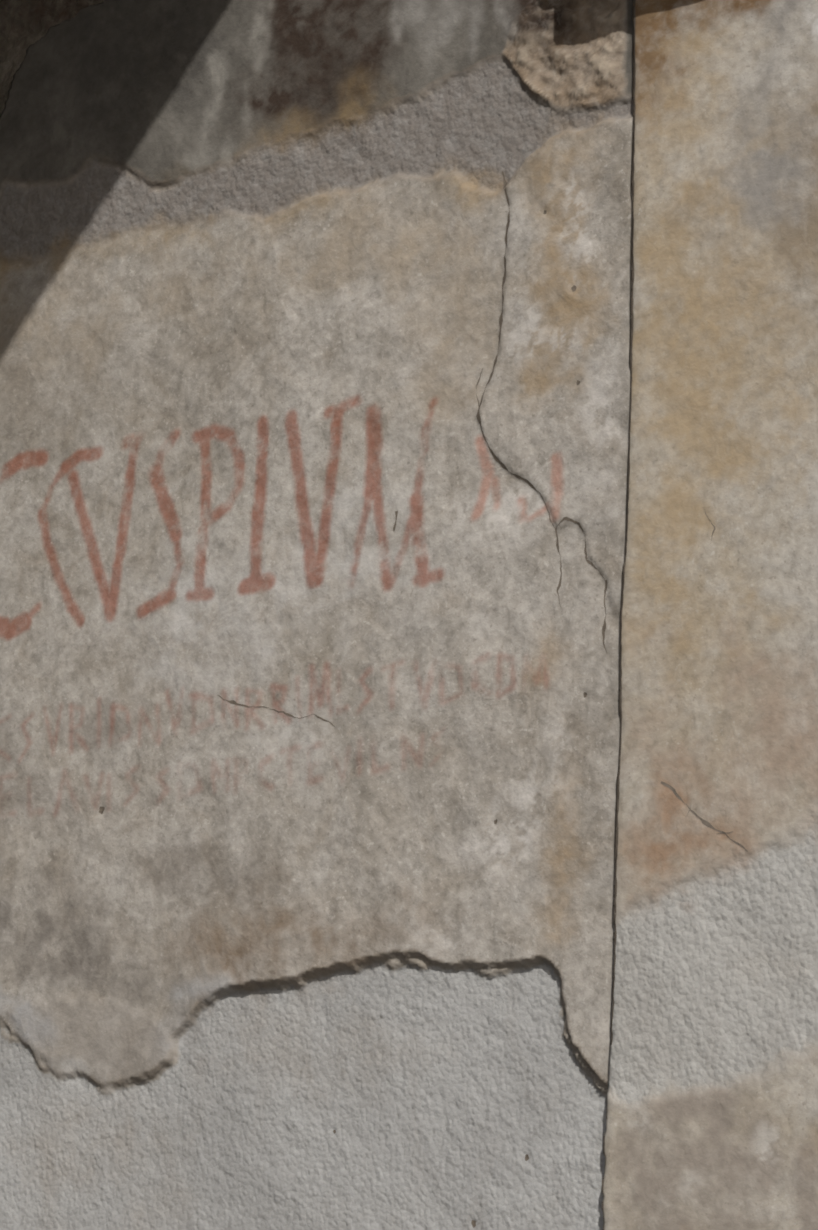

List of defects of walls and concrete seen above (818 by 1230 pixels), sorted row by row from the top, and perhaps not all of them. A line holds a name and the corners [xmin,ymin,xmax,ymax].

crack [476,0,636,1045]
crack [661,781,748,852]
spalling [0,1027,56,1129]
spalling [151,954,608,1230]